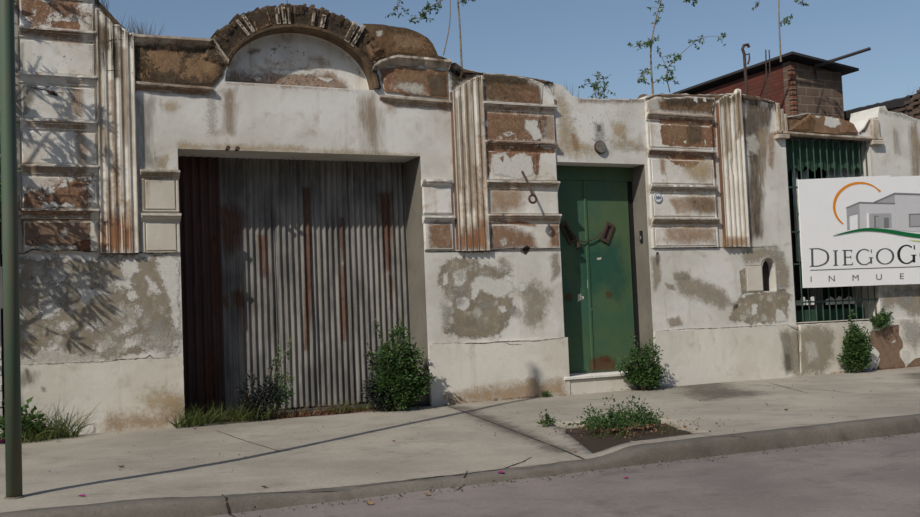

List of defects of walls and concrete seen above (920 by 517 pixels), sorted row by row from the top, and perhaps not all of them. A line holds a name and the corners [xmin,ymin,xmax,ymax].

peeling [14,0,120,77]
water stain [95,0,436,207]
peeling [227,68,348,90]
peeling [483,104,555,179]
spalling [660,117,716,148]
water stain [787,115,858,134]
water stain [648,92,789,289]
peeling [18,172,182,365]
corrosion [303,188,311,348]
peeling [437,256,526,339]
peeling [729,269,791,325]
spalling [868,325,920,370]